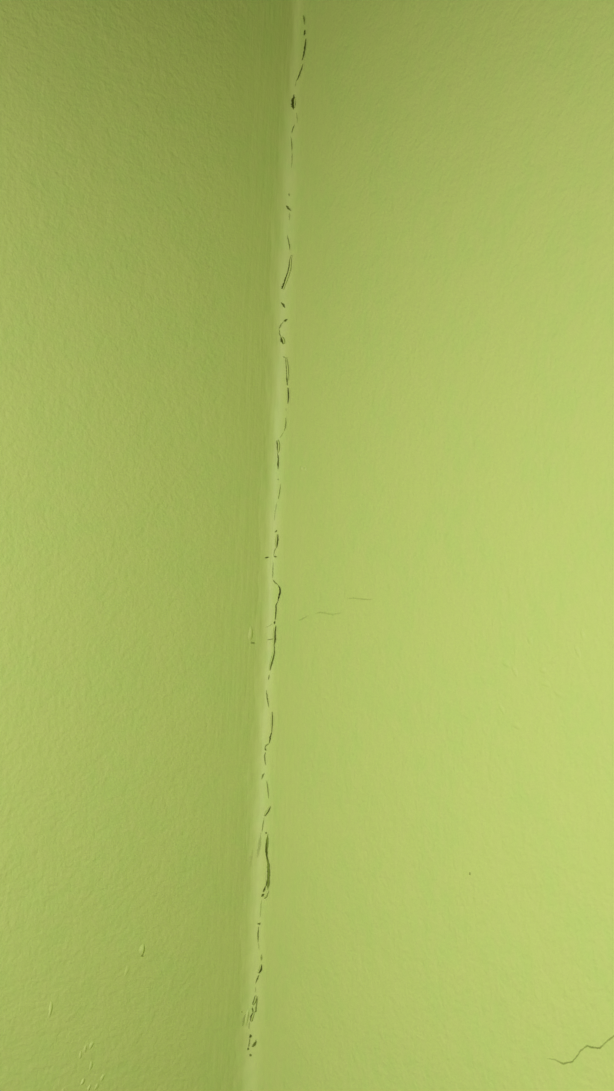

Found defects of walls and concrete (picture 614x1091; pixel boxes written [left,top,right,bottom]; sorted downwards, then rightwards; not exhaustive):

crack [276,206,292,499]
crack [262,530,280,830]
crack [247,923,262,1056]